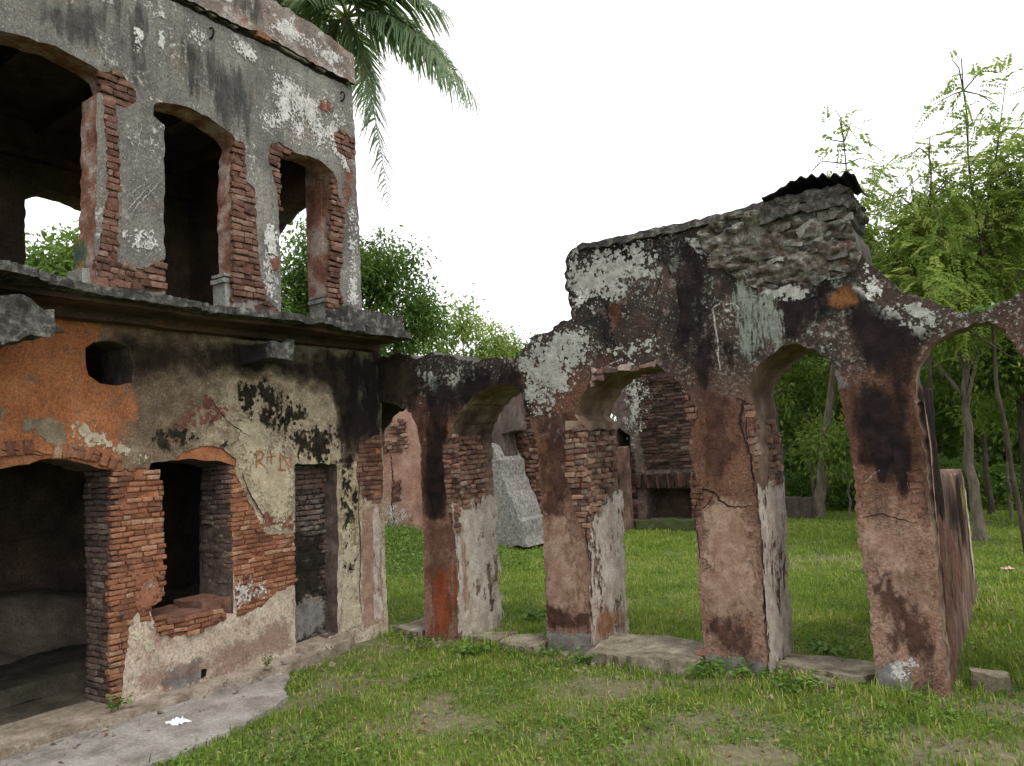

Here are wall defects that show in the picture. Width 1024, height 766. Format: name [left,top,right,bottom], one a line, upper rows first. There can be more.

spalling [92,69,168,294]
spalling [228,66,360,313]
spalling [0,394,298,706]
damp [237,378,358,548]
peeling [341,418,412,632]
damp [413,366,570,519]
peeling [514,361,698,646]
crack [693,398,755,570]
damp [845,289,927,495]
crack [863,513,915,523]